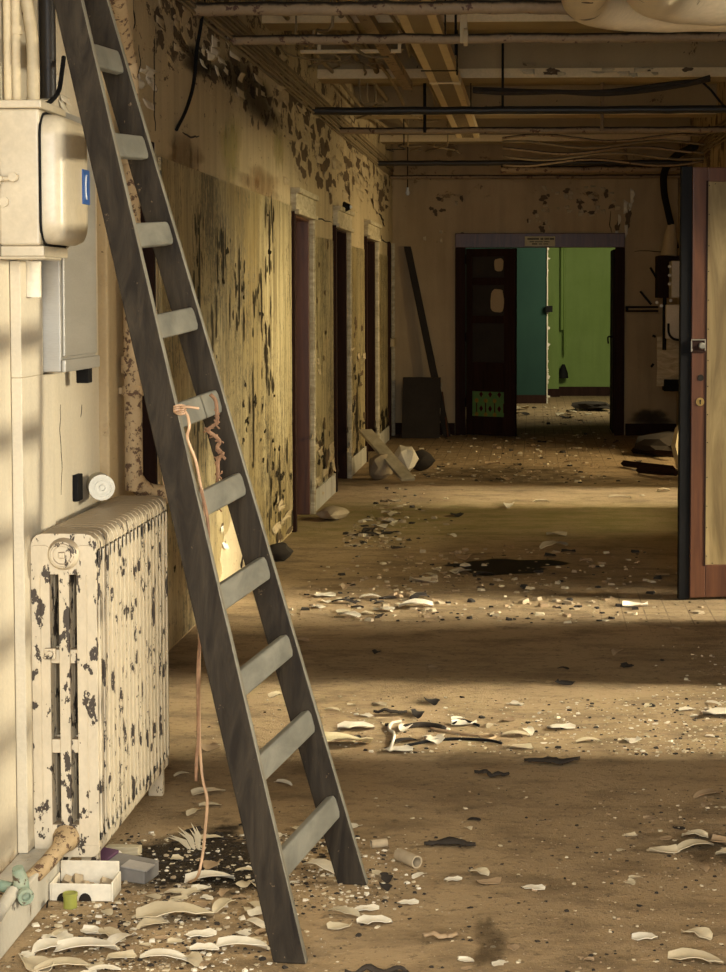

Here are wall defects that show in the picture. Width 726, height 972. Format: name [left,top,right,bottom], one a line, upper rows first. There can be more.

peeling [154,0,392,214]
peeling [272,496,293,543]